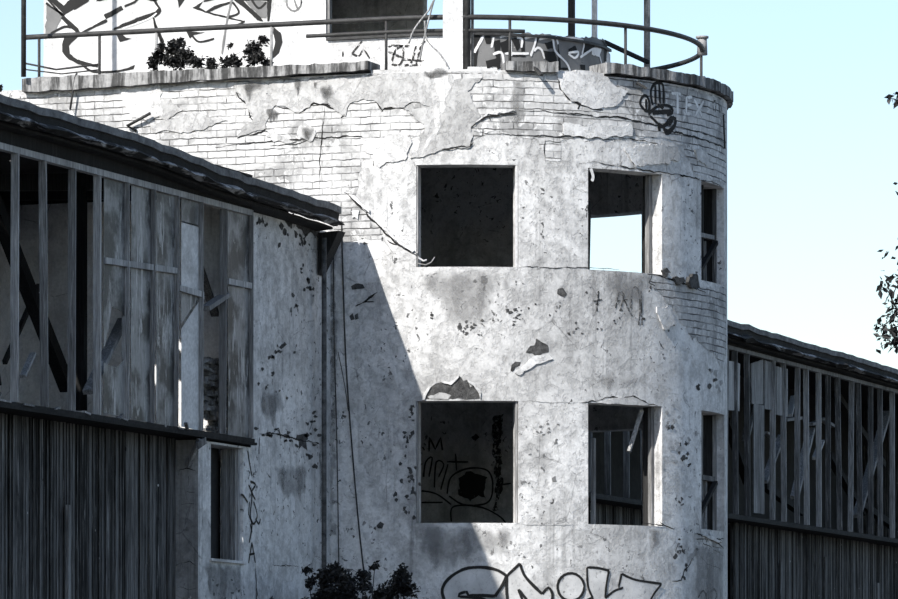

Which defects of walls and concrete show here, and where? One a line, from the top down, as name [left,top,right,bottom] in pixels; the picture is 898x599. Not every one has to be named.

crack [215,92,374,187]
flaking render [15,71,726,242]
crack [443,80,726,162]
crack [580,161,720,186]
flaking render [278,213,320,248]
crack [344,192,417,256]
flaking render [511,339,553,375]
flaking render [645,268,727,392]
flaking render [393,375,481,520]
flaking render [662,431,698,469]